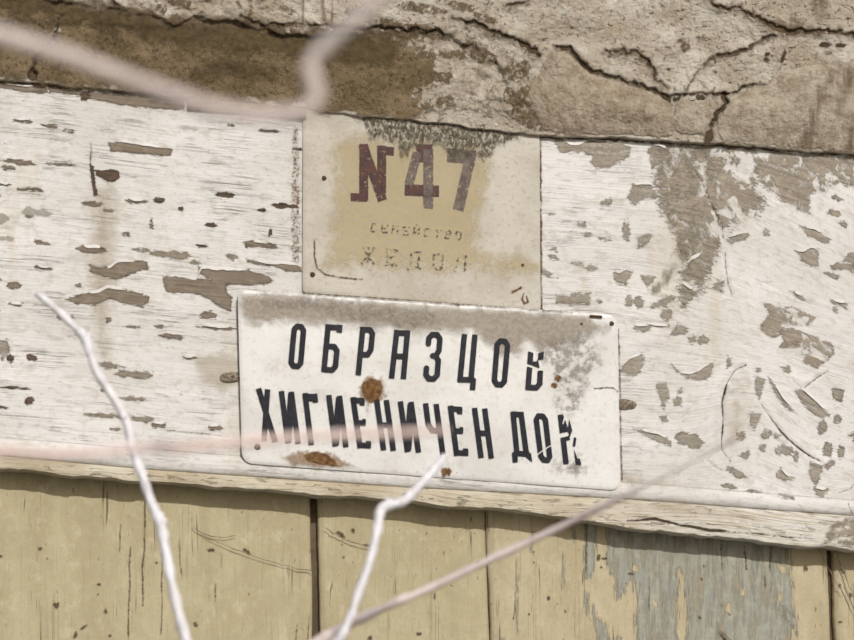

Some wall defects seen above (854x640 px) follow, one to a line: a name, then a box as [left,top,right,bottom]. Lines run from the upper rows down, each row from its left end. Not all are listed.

crack [0,19,159,98]
crack [239,0,854,153]
spalling [80,151,120,213]
peeling [67,227,302,331]
peeling [612,142,854,345]
peeling [760,290,836,368]
rust [287,451,348,467]
rust [360,377,383,403]
crack [720,364,746,470]
crack [766,411,820,461]
peeling [754,368,854,498]
peeling [570,523,799,640]